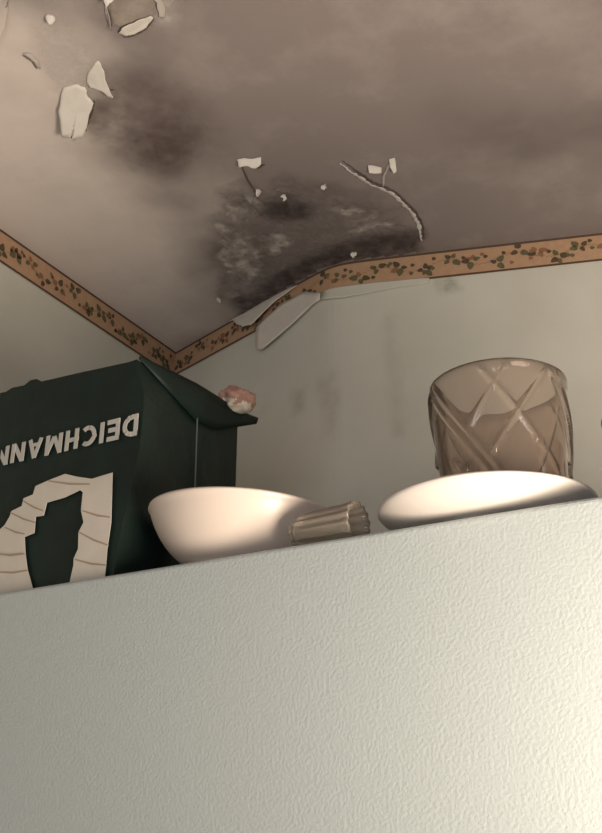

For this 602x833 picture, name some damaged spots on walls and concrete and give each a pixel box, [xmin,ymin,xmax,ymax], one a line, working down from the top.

peeling [104,0,170,38]
peeling [41,25,114,141]
peeling [237,157,265,200]
crack [339,158,424,241]
water stain [214,186,418,310]
peeling [229,285,297,327]